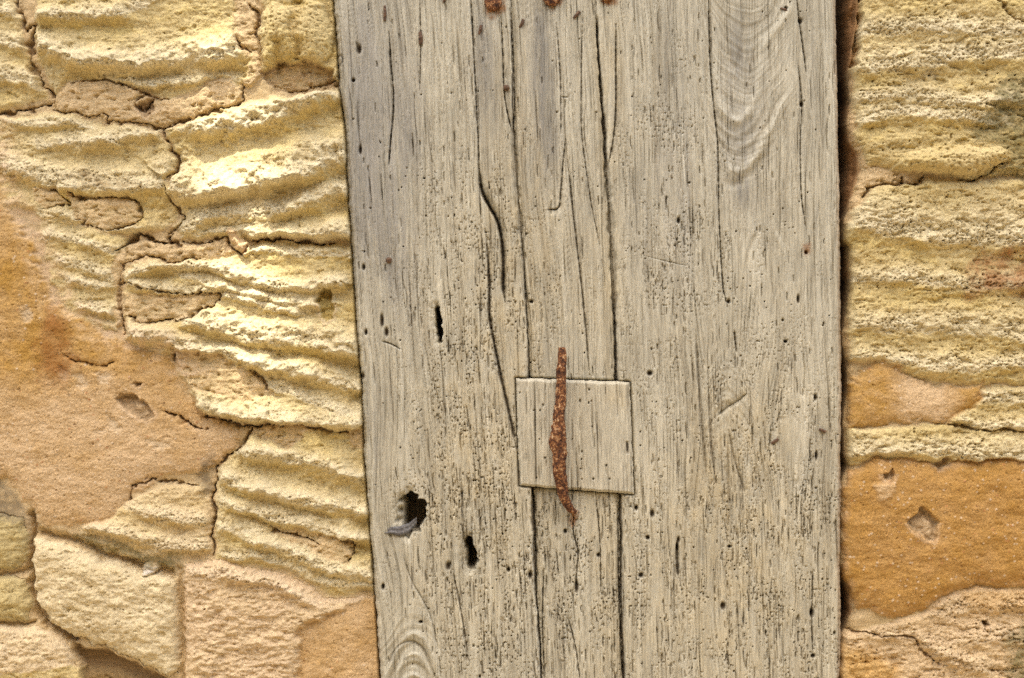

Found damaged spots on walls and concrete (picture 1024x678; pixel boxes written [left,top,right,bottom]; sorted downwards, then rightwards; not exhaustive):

crack [288,76,340,94]
crack [1,0,332,335]
crack [962,158,1008,182]
crack [862,176,925,198]
crack [65,356,115,368]
crack [249,369,268,390]
crack [129,411,349,554]
crack [270,525,356,562]